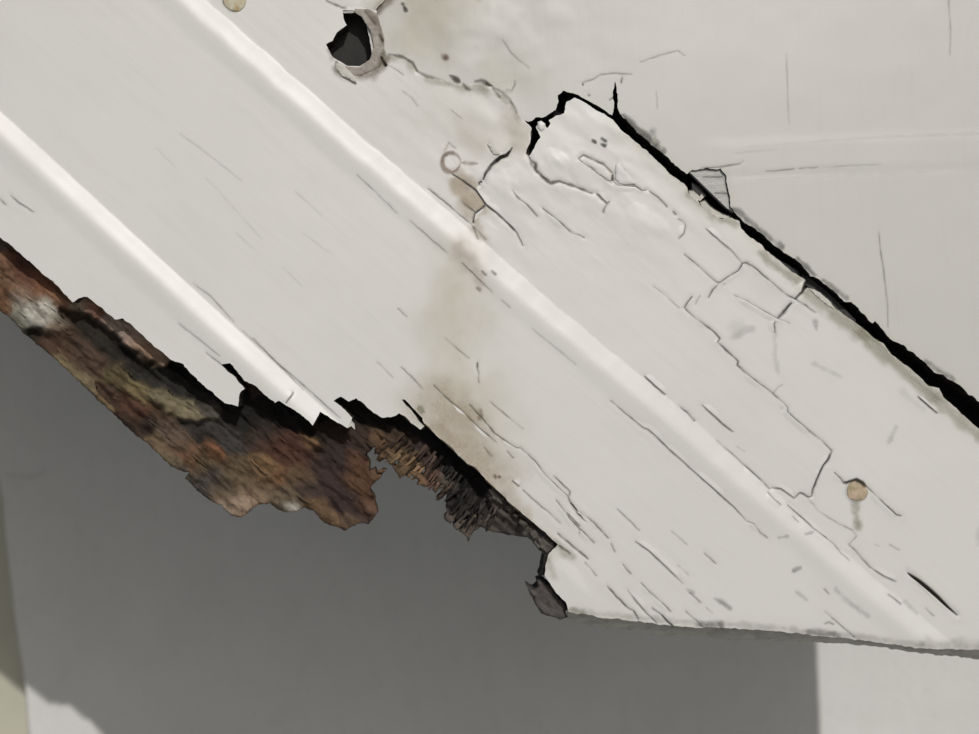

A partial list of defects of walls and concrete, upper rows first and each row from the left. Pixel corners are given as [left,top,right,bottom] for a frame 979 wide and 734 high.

crack [380,39,418,71]
peeling [688,190,730,219]
crack [433,84,901,607]
crack [918,394,939,413]
spalling [525,553,568,620]
crack [610,564,674,627]